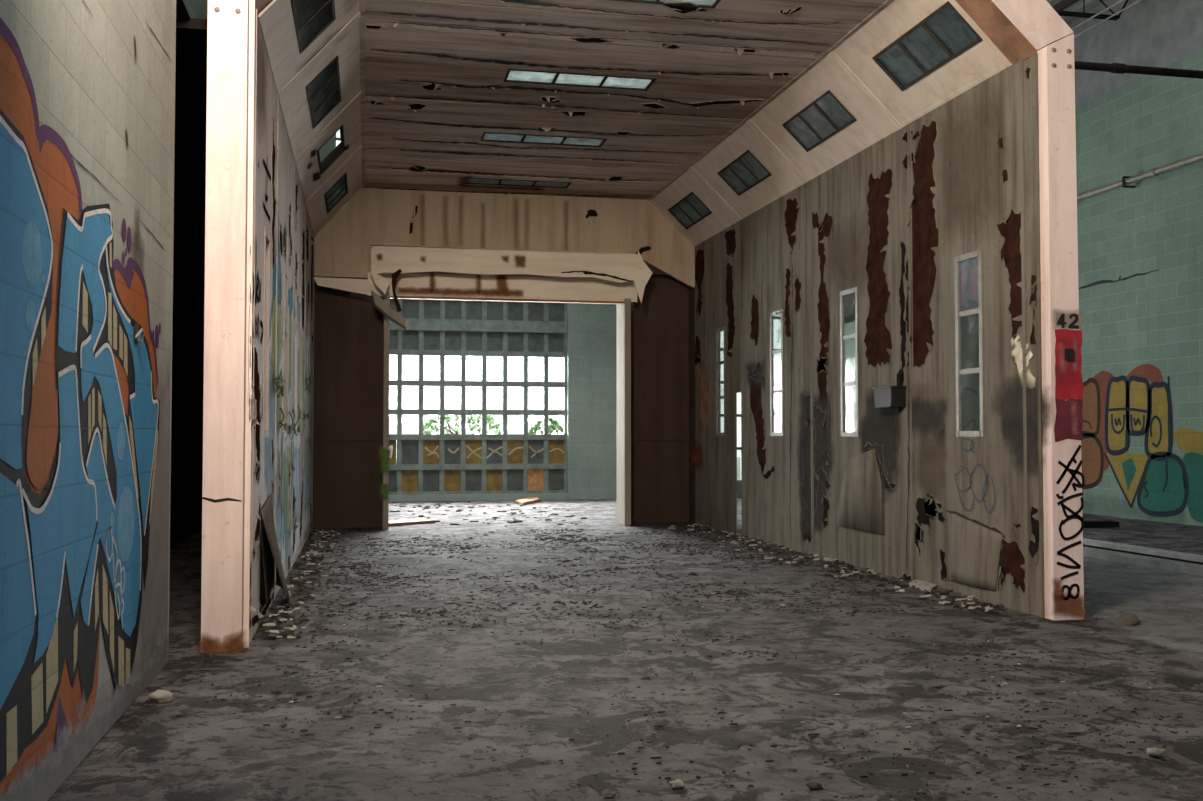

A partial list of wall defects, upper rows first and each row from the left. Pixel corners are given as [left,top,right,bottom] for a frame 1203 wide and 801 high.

crack [365,0,845,198]
peeling [271,116,314,346]
peeling [864,119,940,386]
peeling [997,207,1037,389]
crack [1078,270,1159,289]
peeling [249,335,313,618]